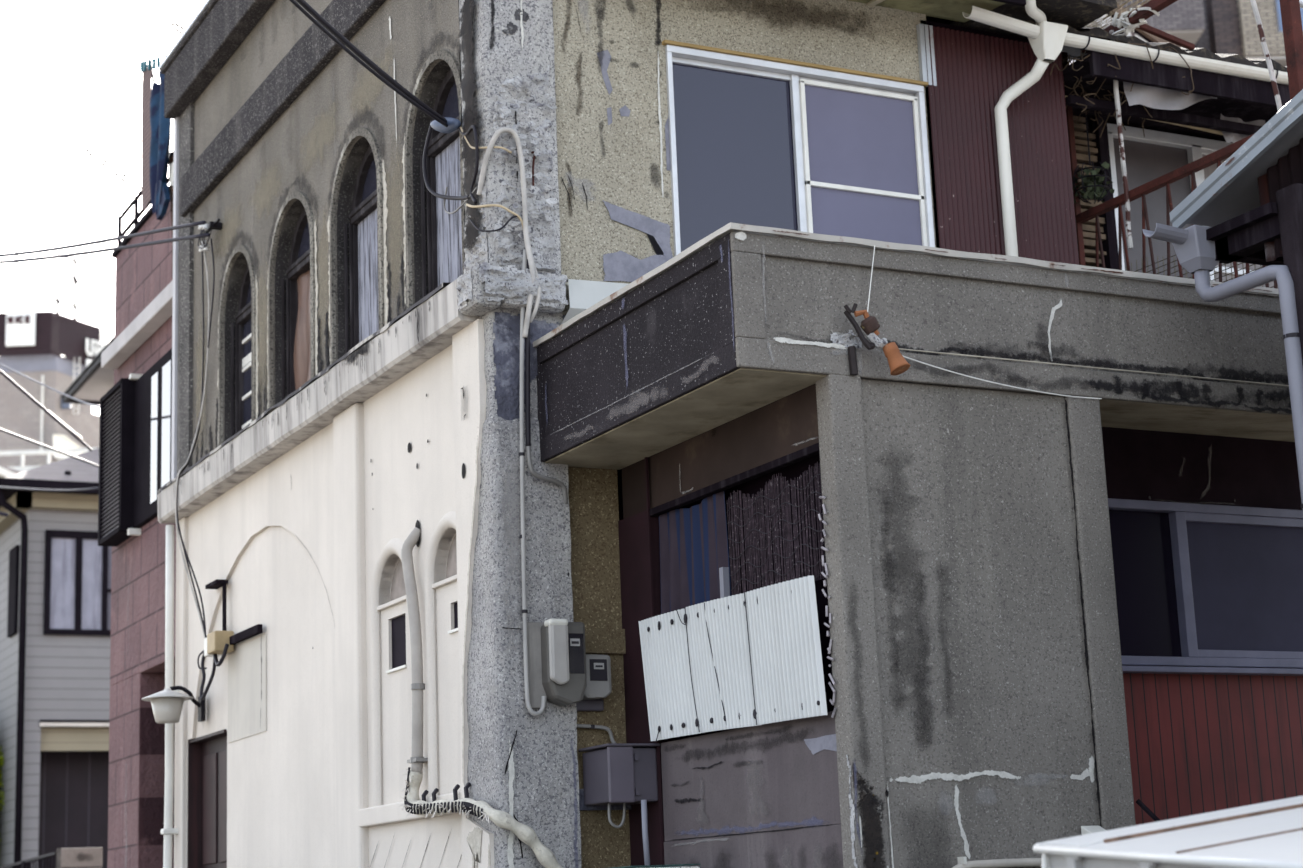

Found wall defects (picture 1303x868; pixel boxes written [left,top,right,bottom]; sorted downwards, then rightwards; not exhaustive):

damp [729,0,864,33]
spalling [456,65,568,421]
damp [387,252,407,324]
damp [257,364,268,418]
damp [316,312,330,373]
damp [887,340,1292,414]
crack [1070,756,1095,783]
crack [885,770,1021,868]